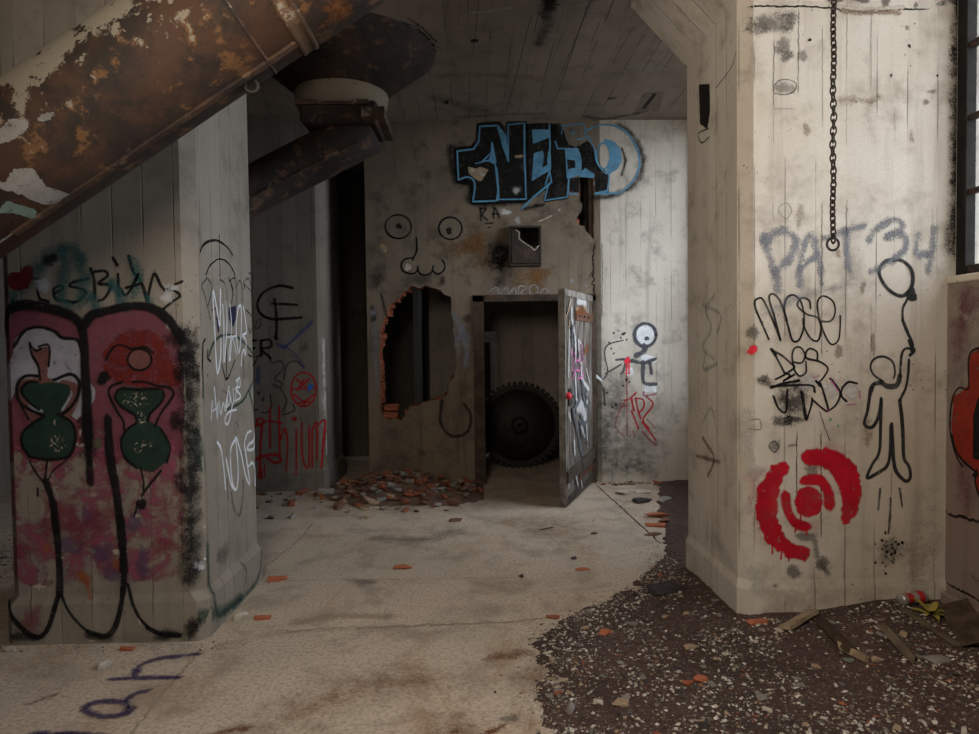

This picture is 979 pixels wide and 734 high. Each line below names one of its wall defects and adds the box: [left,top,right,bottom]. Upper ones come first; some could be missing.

crack [747,0,929,106]
peeling [0,112,54,144]
peeling [0,168,69,218]
spalling [380,287,455,419]